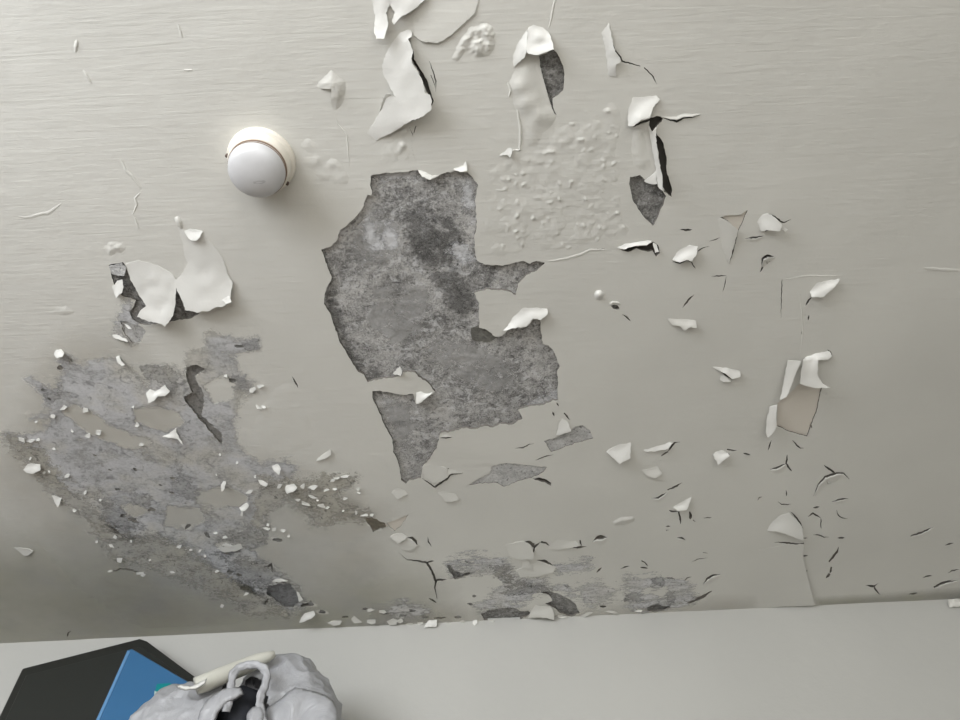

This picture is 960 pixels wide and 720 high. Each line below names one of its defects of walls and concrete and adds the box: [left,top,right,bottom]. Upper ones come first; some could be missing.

peeling [367,0,478,141]
peeling [508,25,564,147]
spalling [628,96,671,224]
peeling [109,227,233,343]
spalling [322,162,559,502]
peeling [766,351,832,437]
peeling [1,331,696,628]
crack [407,537,437,600]
crack [770,442,799,474]
crack [793,465,849,576]